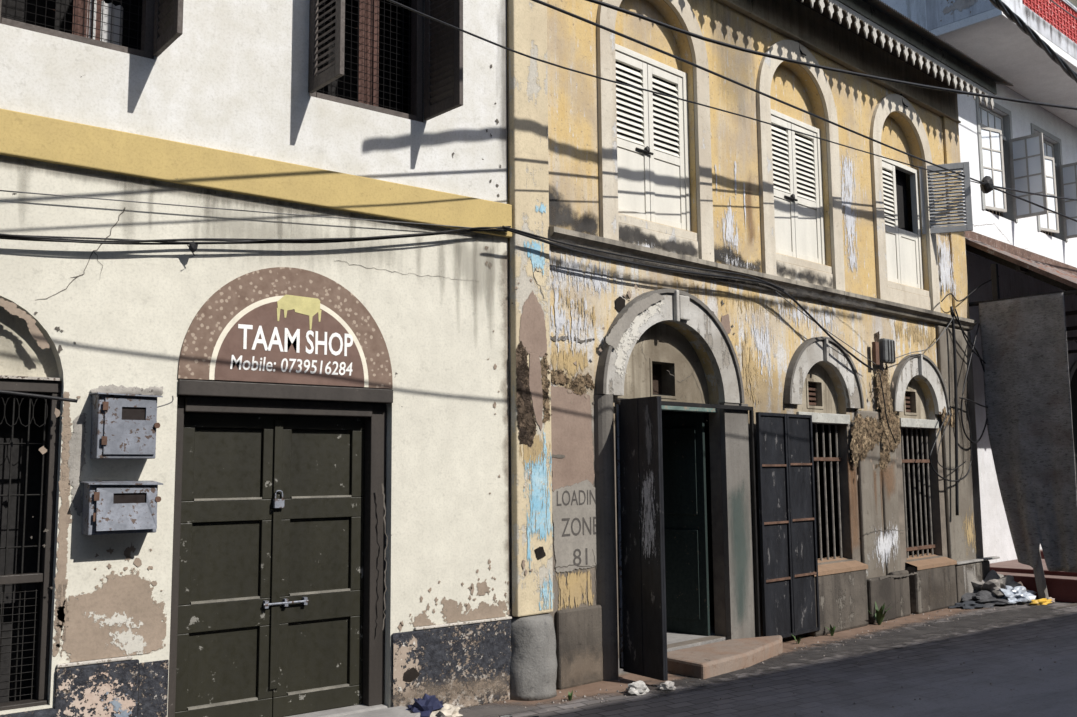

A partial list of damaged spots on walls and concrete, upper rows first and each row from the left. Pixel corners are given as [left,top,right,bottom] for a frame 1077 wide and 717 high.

crack [37,207,125,300]
damp [549,188,874,308]
flaking render [0,298,76,353]
flaking render [515,239,667,610]
damp [595,288,745,404]
damp [784,336,864,409]
peeling [30,391,167,717]
peeling [393,559,511,702]